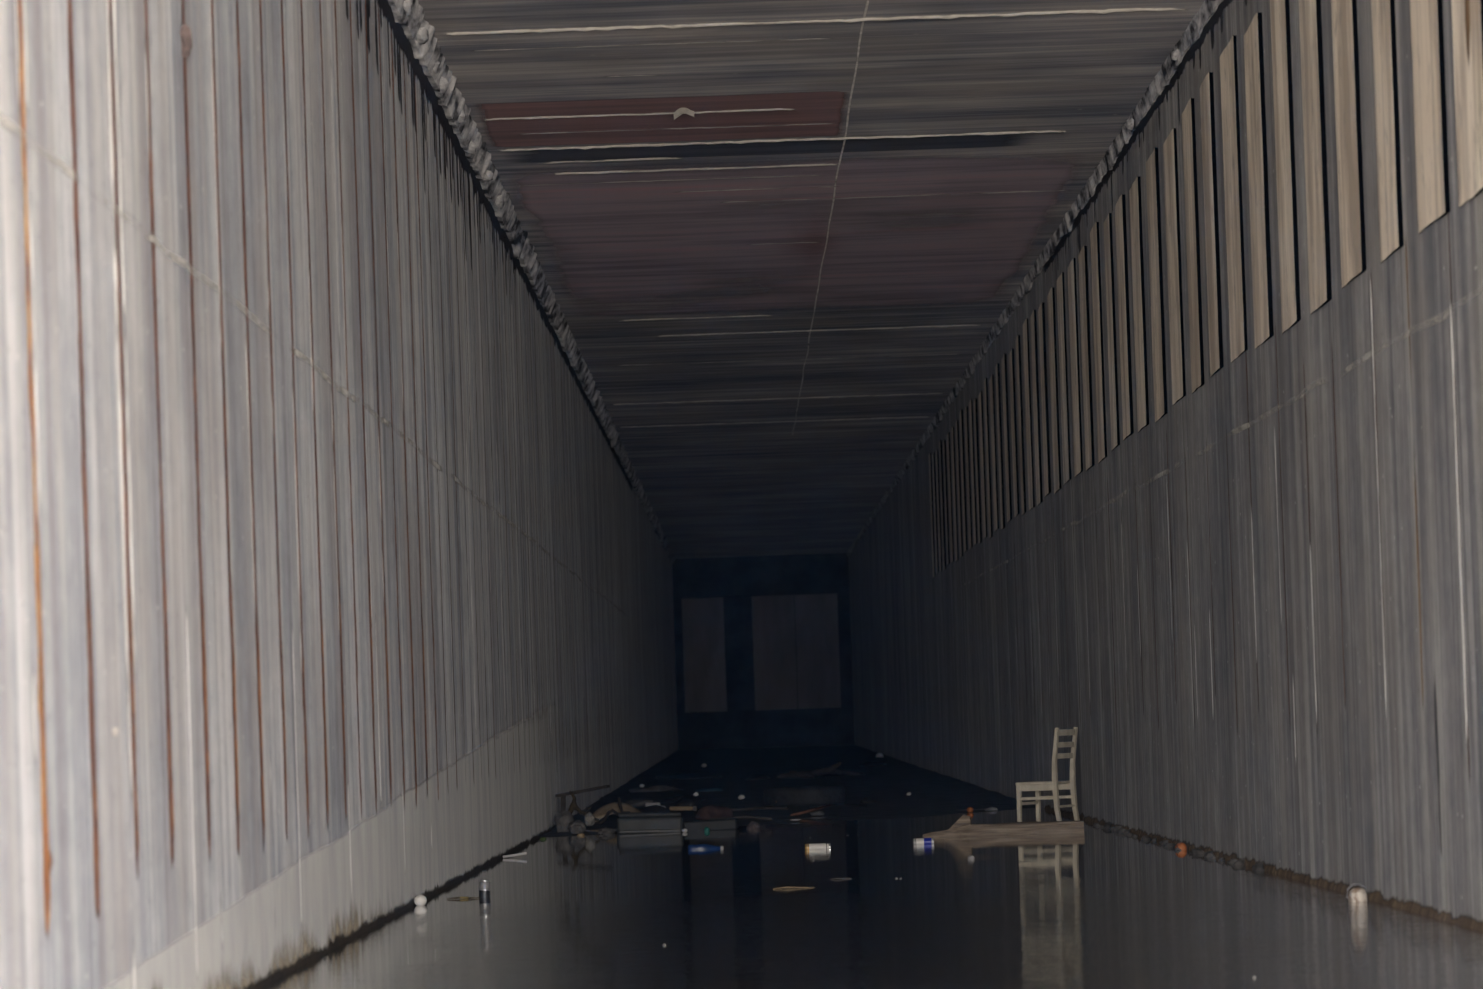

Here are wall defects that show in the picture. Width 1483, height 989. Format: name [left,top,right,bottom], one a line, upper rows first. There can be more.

rust [15,0,52,934]
rust [144,0,174,867]
rust [183,57,211,856]
leakage [107,498,565,989]
crack [792,0,869,435]